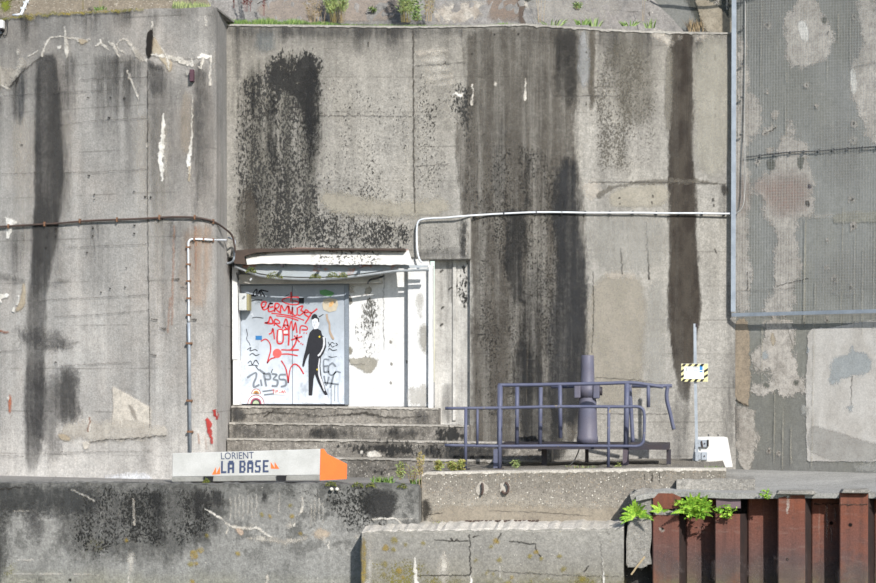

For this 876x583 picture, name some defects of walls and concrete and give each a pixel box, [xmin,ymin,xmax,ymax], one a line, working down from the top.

peeling [782,0,836,70]
peeling [849,0,876,145]
damp [0,27,212,451]
peeling [695,0,816,470]
damp [0,473,330,582]
damp [293,484,402,538]
damp [422,501,440,520]
crack [418,533,542,576]